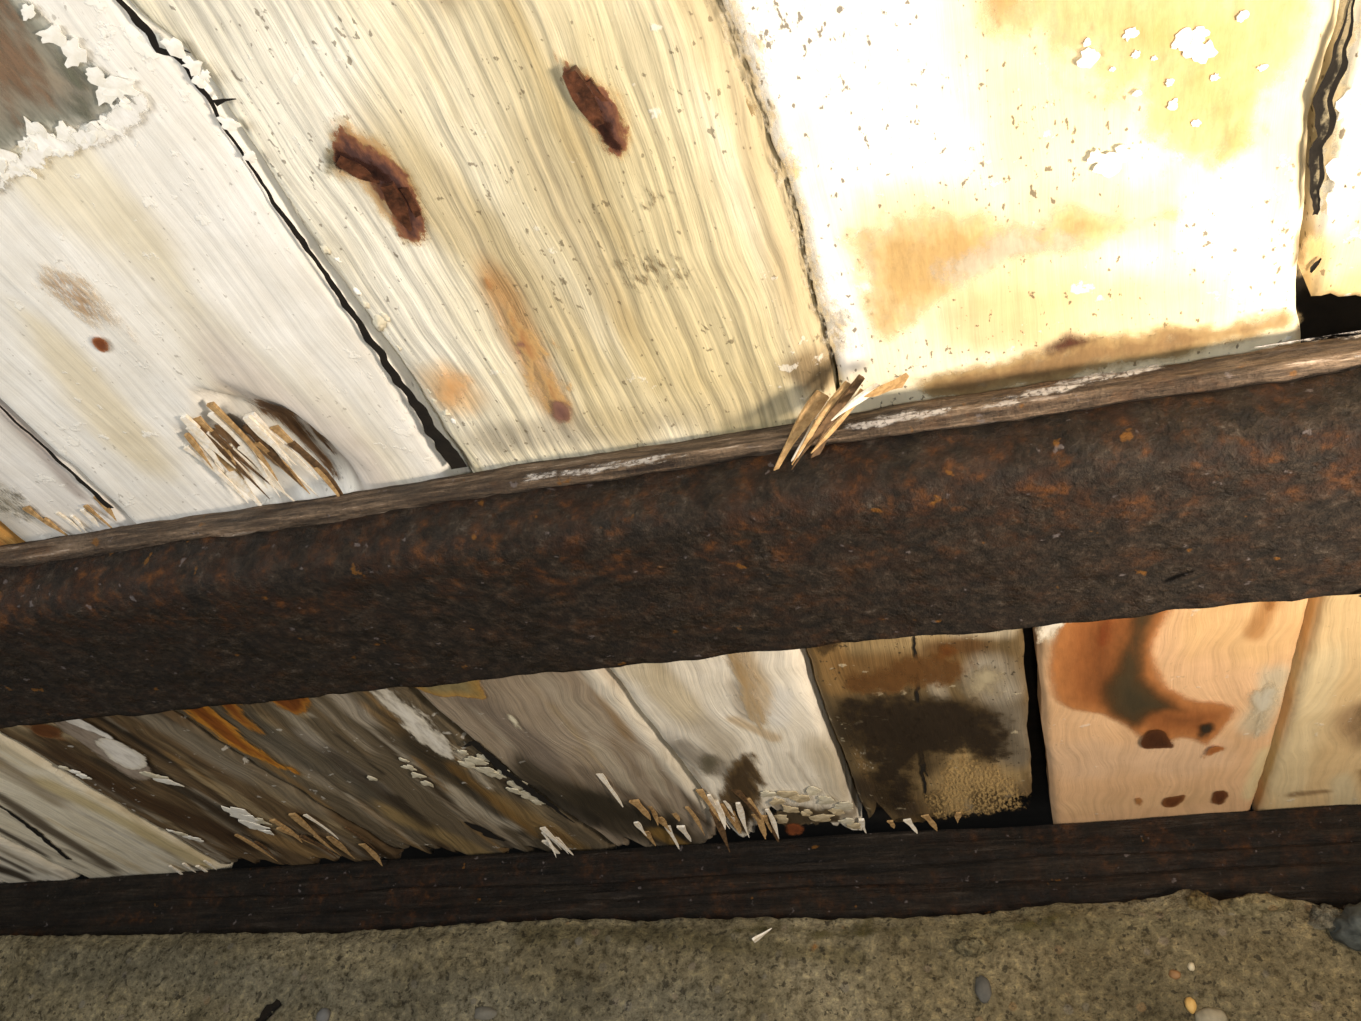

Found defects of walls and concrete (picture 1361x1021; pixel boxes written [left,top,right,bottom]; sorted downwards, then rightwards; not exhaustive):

peeling [0,0,149,191]
corrosion [562,61,630,157]
water stain [992,0,1310,162]
corrosion [332,122,427,246]
water stain [857,205,1122,337]
water stain [846,407,951,429]
water stain [983,365,1160,408]
corrosion [921,311,1294,397]
corrosion [416,680,486,700]
water stain [1037,610,1233,756]
corrosion [185,704,300,775]
crack [256,999,281,1021]